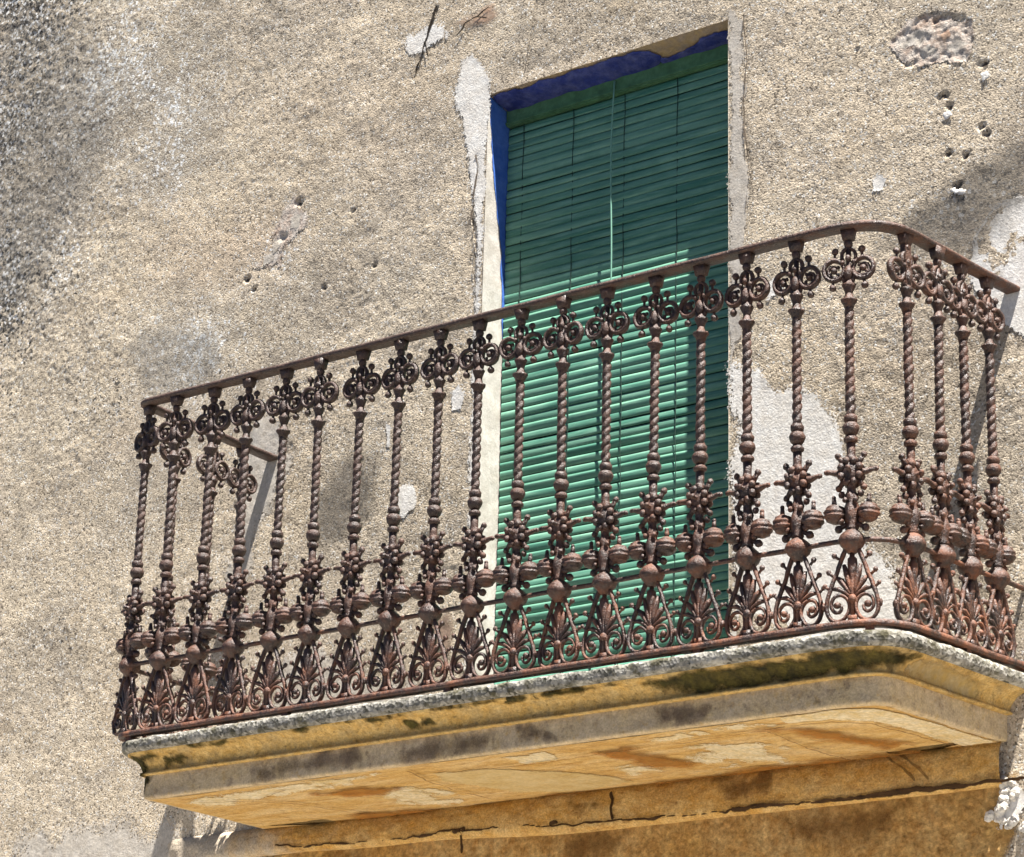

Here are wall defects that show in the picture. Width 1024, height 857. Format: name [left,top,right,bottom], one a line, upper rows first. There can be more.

crack [414,7,437,78]
flaking render [889,13,974,67]
crack [523,722,1024,827]
crack [275,826,498,853]